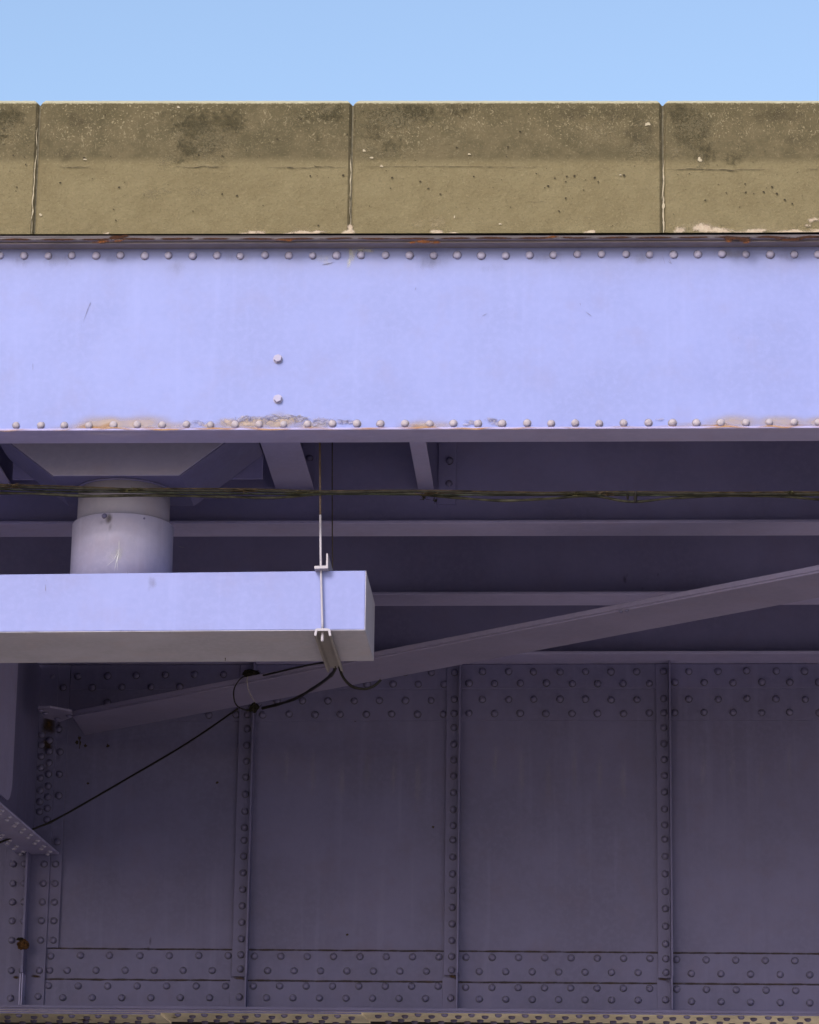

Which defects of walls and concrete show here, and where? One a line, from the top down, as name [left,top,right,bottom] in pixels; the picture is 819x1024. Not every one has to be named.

rust [78,419,178,430]
rust [202,421,288,430]
rust [16,937,29,950]